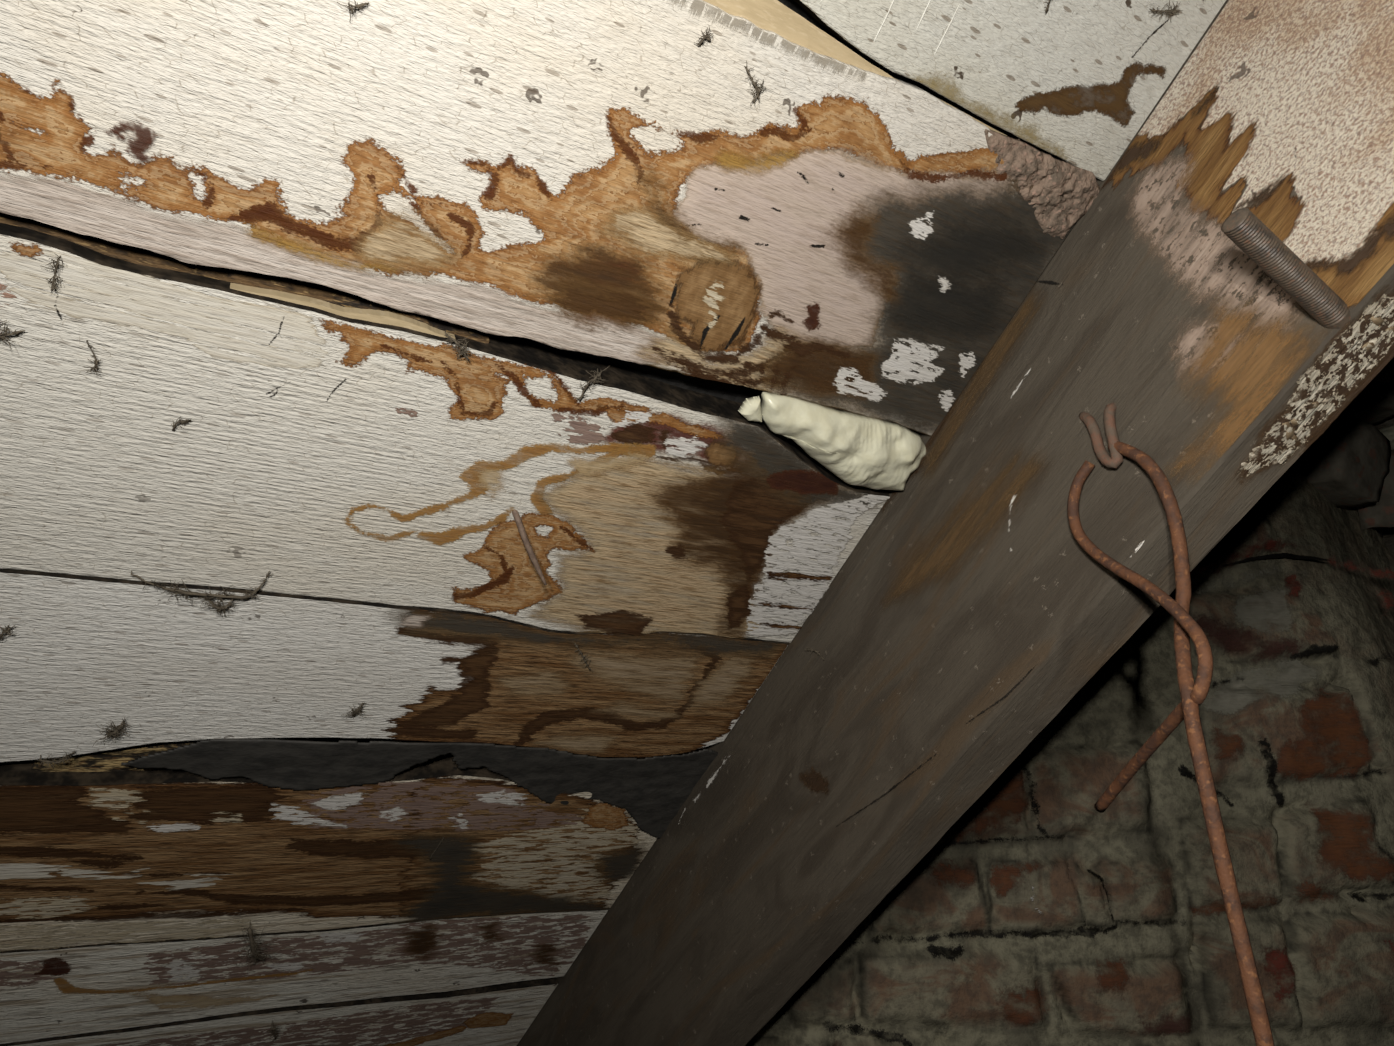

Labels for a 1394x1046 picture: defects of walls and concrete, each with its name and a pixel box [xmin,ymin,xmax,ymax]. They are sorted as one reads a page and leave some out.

damp [916,62,1306,243]
peeling [1138,0,1394,266]
peeling [0,148,1012,412]
peeling [1132,161,1296,374]
damp [1306,203,1394,308]
damp [0,72,1076,757]
peeling [552,413,606,445]
damp [1175,309,1308,469]
peeling [532,459,890,638]
damp [0,776,644,951]
crack [1178,765,1234,807]
crack [1258,738,1285,807]